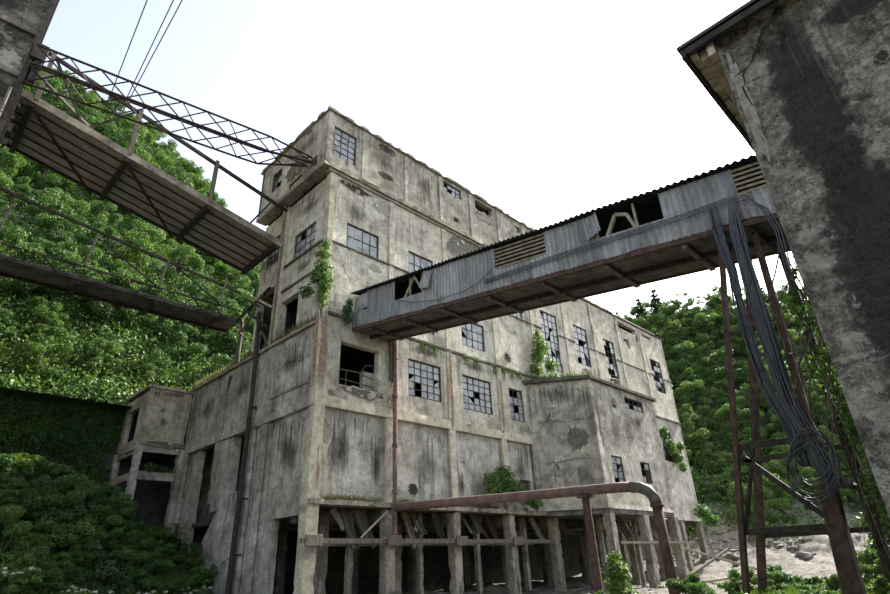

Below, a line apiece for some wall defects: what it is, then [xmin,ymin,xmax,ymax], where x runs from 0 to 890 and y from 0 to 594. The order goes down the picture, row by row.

spalling [0,23,25,69]
crack [735,6,785,107]
spalling [873,49,890,66]
spalling [0,79,9,96]
leakage [761,12,890,367]
spalling [567,427,589,449]
crack [538,409,654,444]
corrosion [393,481,680,594]